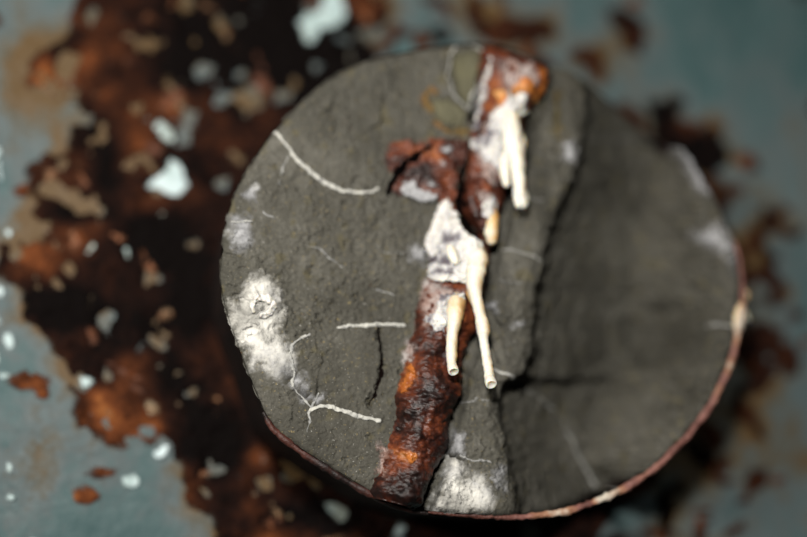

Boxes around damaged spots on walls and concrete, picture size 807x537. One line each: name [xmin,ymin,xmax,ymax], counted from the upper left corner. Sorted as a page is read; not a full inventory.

corrosion [465,0,557,55]
corrosion [604,0,647,56]
crack [272,131,379,195]
corrosion [385,86,469,204]
crack [441,45,482,239]
water stain [470,56,540,221]
corrosion [646,95,760,216]
corrosion [0,0,411,537]
water stain [412,198,483,332]
crack [289,322,406,429]
corrosion [729,320,807,442]
corrosion [404,470,660,537]